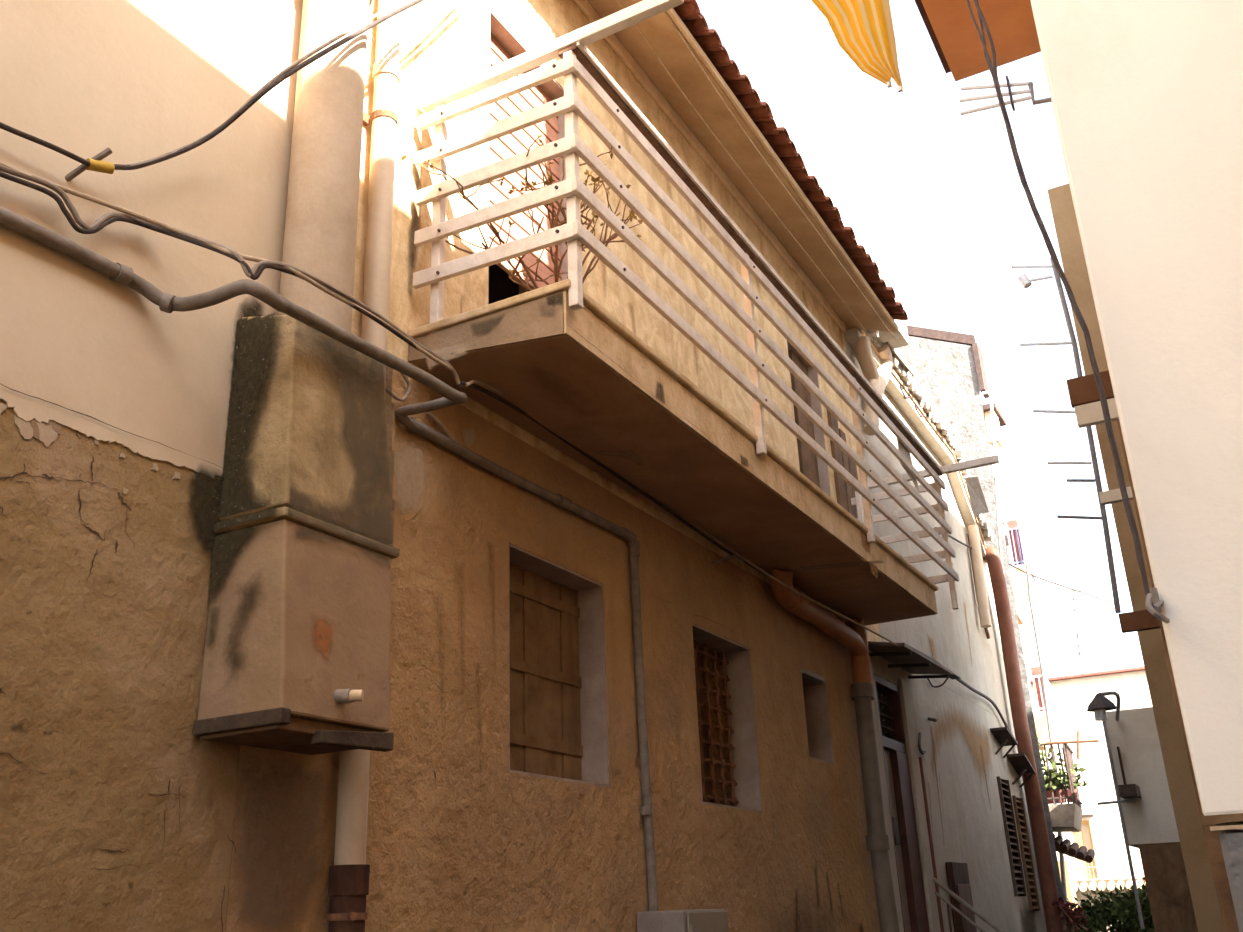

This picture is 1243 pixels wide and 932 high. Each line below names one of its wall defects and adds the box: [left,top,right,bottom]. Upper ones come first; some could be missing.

crack [0,430,135,585]
peeling [0,384,222,468]
damp [191,299,399,644]
crack [91,781,181,871]